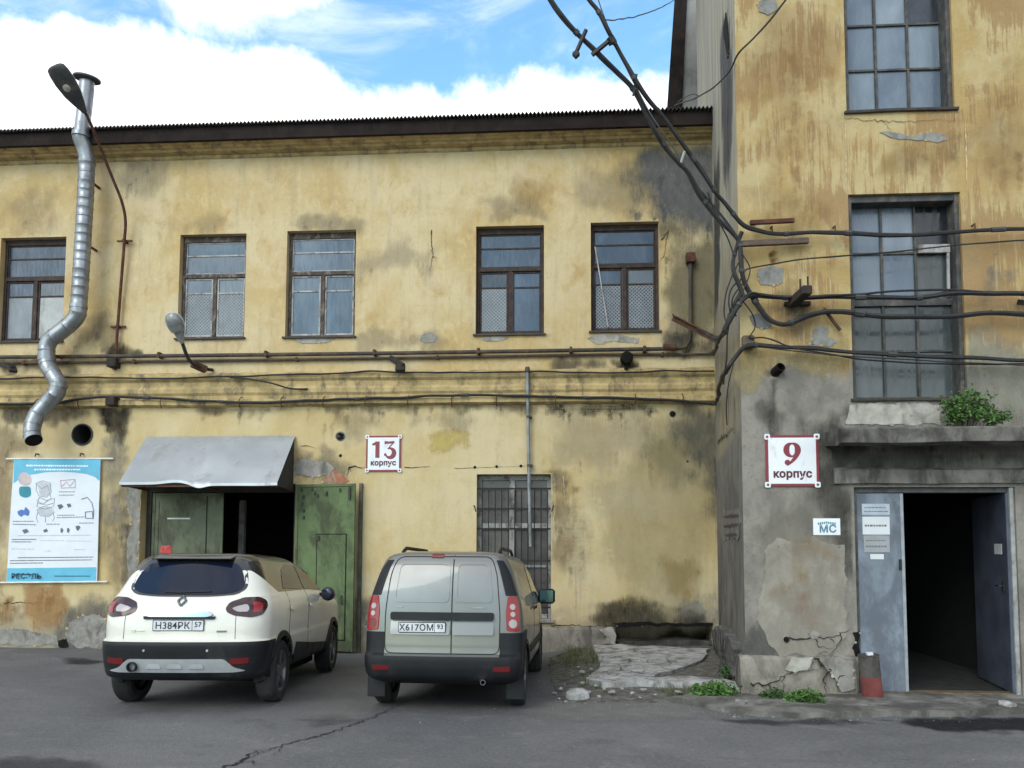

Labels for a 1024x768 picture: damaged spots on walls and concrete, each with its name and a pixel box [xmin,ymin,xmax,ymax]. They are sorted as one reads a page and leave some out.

peeling [879,131,948,143]
leakage [631,20,732,338]
peeling [757,266,784,287]
peeling [587,334,640,344]
peeling [808,325,838,347]
peeling [294,431,349,484]
peeling [756,536,861,692]
crack [750,630,849,692]